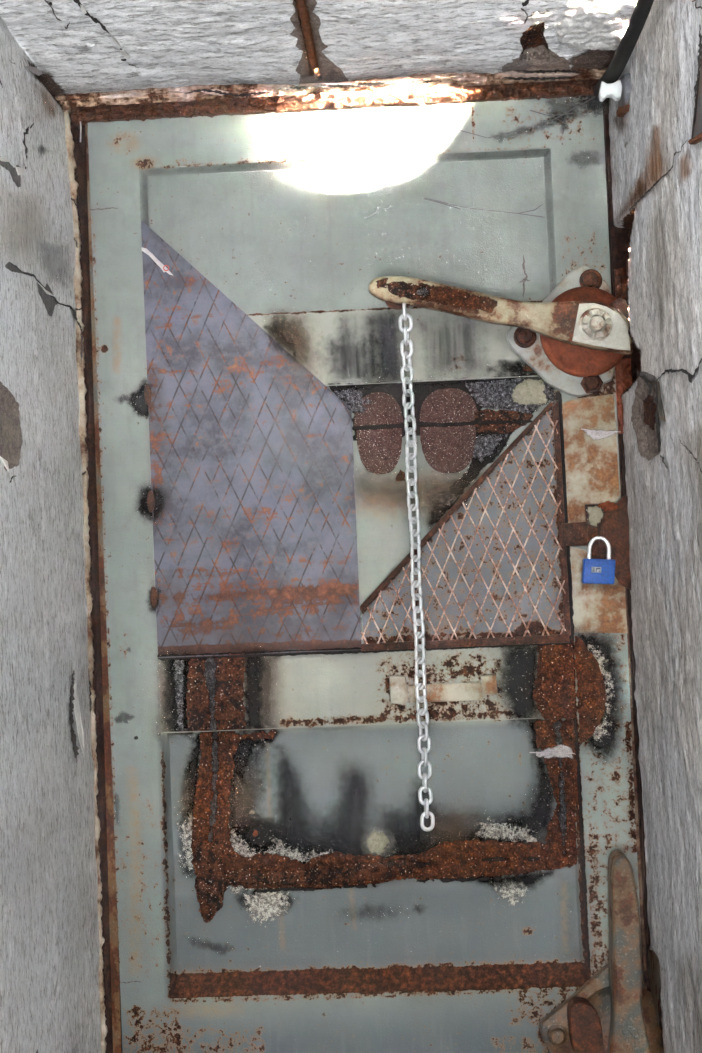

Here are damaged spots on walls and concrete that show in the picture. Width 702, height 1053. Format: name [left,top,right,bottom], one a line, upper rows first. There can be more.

crack [44,0,136,67]
spalling [290,0,359,86]
crack [10,262,83,364]
spalling [621,208,667,468]
crack [655,358,702,383]
spalling [0,382,23,483]
rust [597,500,619,511]
rust [185,636,607,923]